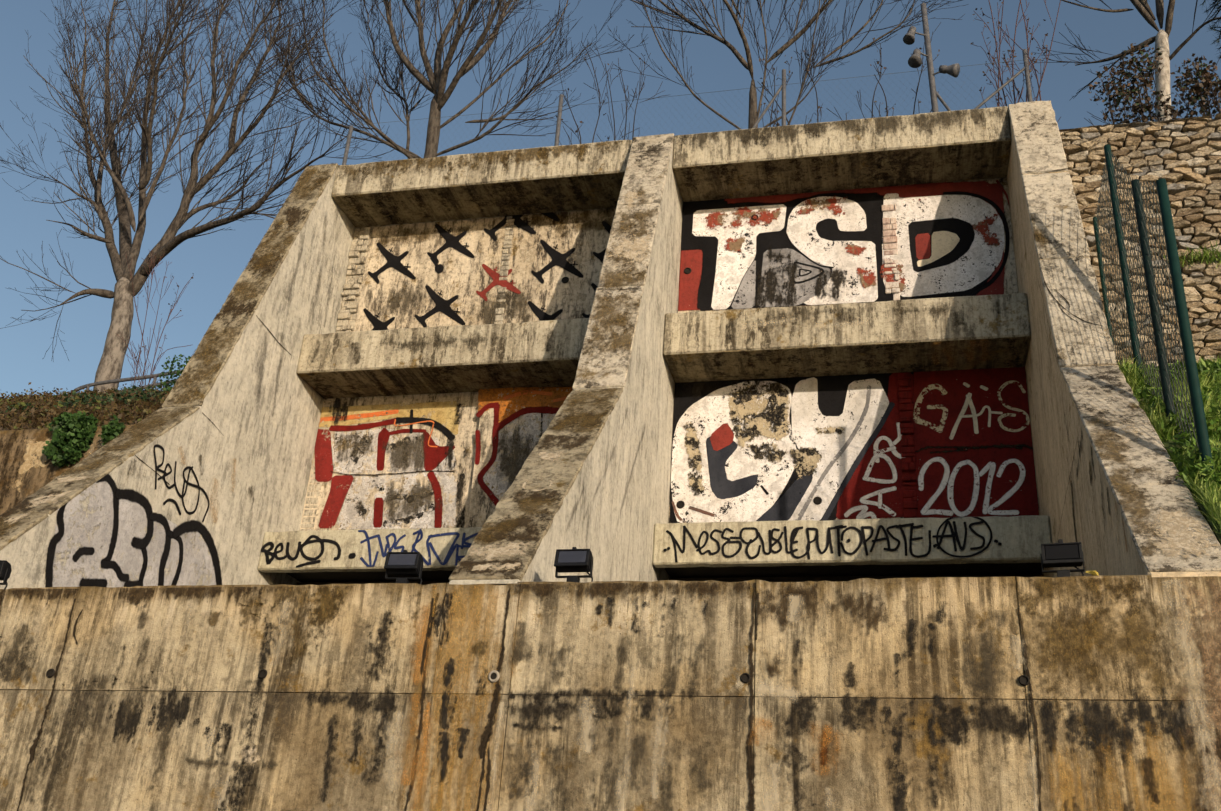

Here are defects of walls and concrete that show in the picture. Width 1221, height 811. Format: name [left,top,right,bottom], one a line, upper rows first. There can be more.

peeling [702,206,781,252]
peeling [844,244,906,294]
flaking render [683,422,706,496]
flaking render [727,381,845,480]
crack [17,599,83,811]
water stain [27,586,282,811]
water stain [307,610,400,802]
rust [403,584,497,811]
water stain [437,658,470,782]
water stain [452,558,889,811]
crack [746,583,760,811]
water stain [839,602,1221,811]